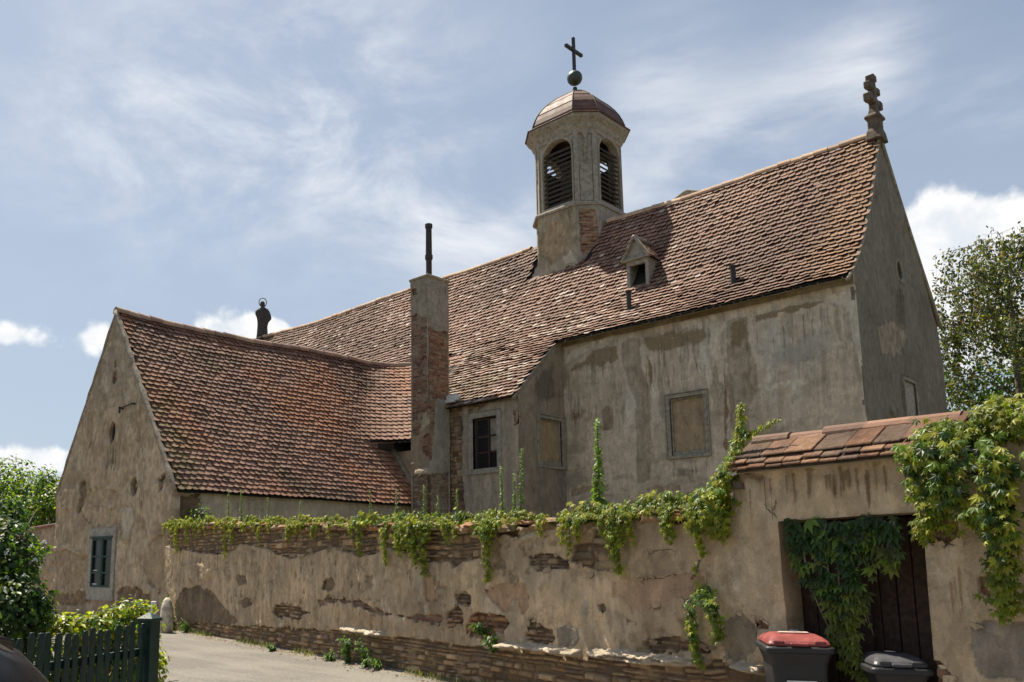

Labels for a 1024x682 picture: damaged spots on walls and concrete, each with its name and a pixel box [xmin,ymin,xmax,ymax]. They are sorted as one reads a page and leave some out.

flaking render [118,312,520,605]
water stain [825,465,887,505]
flaking render [530,526,615,578]
flaking render [174,574,769,682]